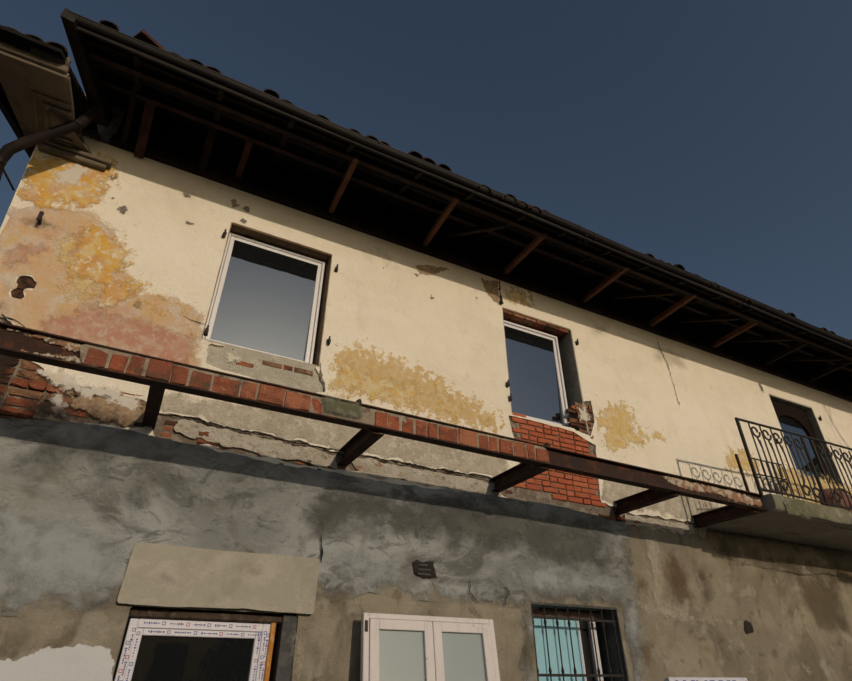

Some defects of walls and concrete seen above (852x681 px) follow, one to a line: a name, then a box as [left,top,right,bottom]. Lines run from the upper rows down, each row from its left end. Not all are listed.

spalling [0,25,89,119]
peeling [0,145,505,434]
spalling [160,393,513,497]
peeling [566,400,666,452]
spalling [599,475,763,538]
peeling [725,447,759,477]
peeling [775,464,852,505]